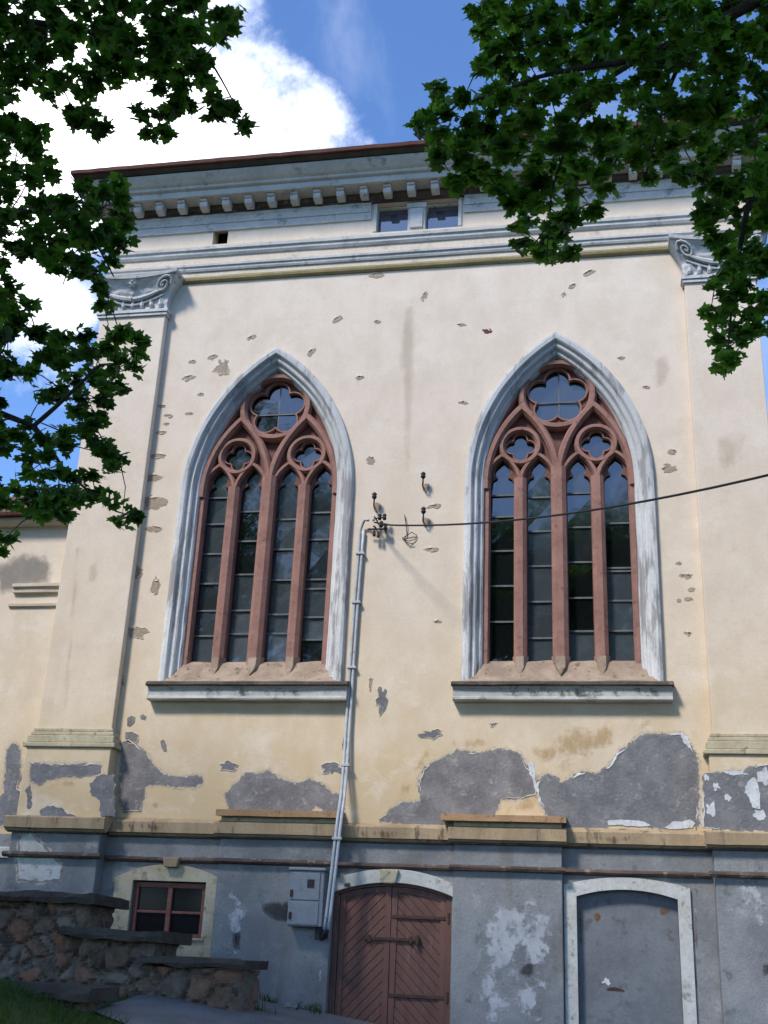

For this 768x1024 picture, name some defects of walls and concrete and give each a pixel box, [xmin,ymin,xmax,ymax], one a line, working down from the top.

peeling [182,353,230,382]
spalling [380,731,768,832]
peeling [13,833,64,885]